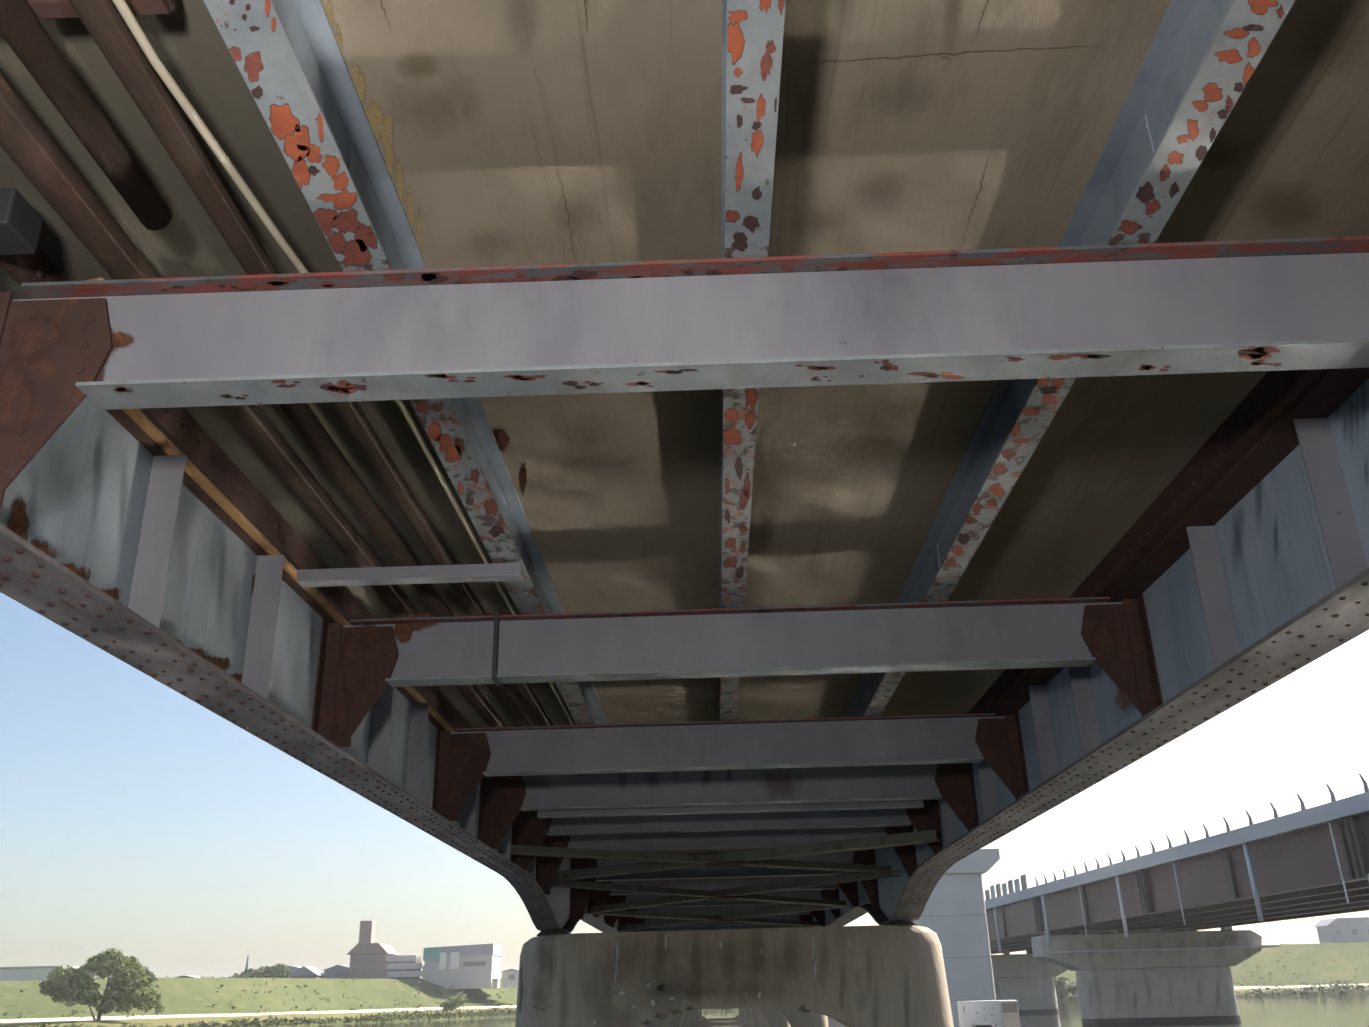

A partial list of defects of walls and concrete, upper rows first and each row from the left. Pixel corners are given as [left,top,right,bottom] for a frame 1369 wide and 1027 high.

peeling [229,0,276,32]
peeling [229,46,377,266]
peeling [320,0,343,53]
peeling [350,65,422,249]
peeling [726,0,785,252]
peeling [1118,0,1284,235]
peeling [415,399,506,537]
peeling [723,388,758,578]
peeling [945,378,1065,568]